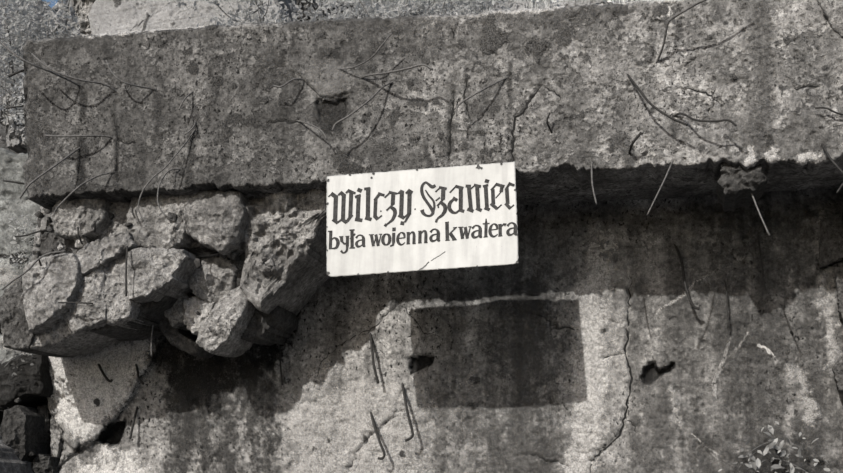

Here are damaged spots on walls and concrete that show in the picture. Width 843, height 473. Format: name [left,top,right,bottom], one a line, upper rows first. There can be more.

leakage [48,340,149,446]
leakage [77,446,151,473]
leakage [160,371,281,473]
spalling [410,355,435,375]
leakage [449,231,614,473]
crack [523,453,569,467]
crack [589,276,636,473]
spalling [640,363,675,384]